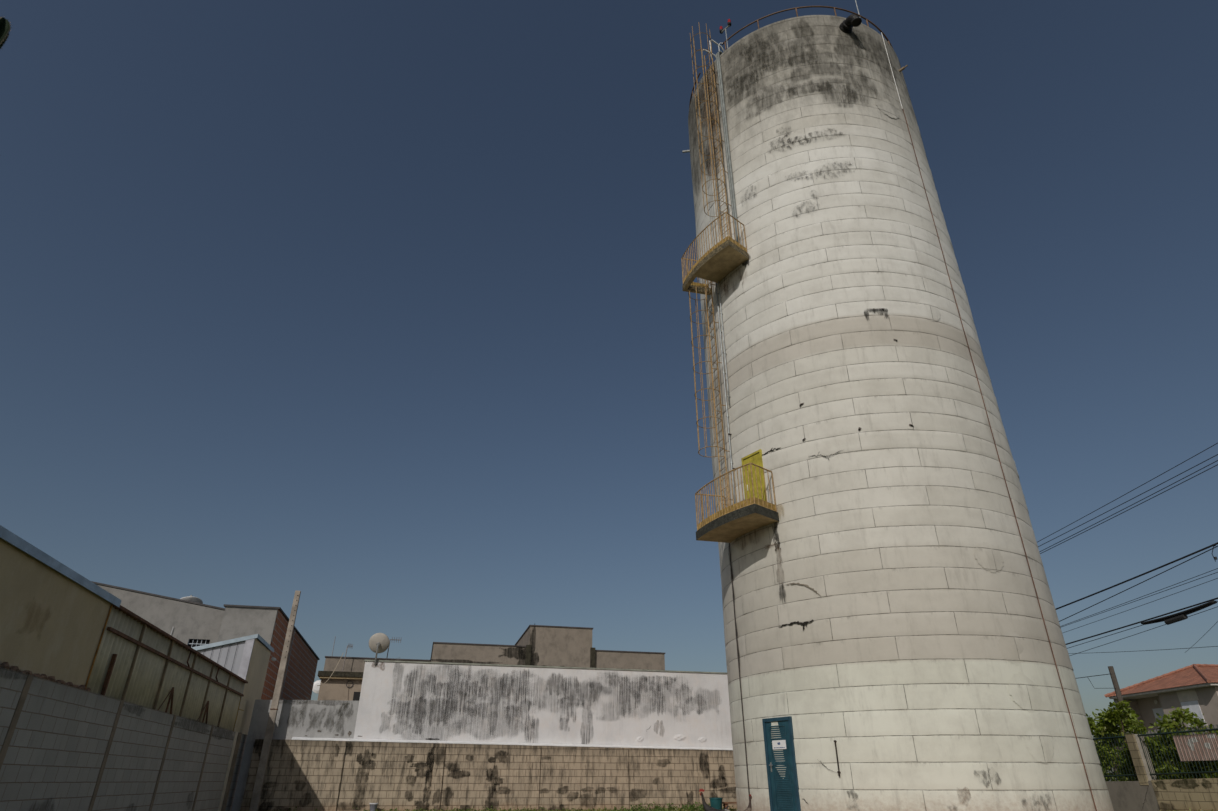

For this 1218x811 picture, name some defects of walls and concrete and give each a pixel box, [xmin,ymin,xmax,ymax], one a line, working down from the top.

damp [726,22,895,106]
crack [780,619,814,631]
damp [410,624,539,740]
damp [285,702,374,811]
damp [405,748,473,811]
damp [485,750,510,809]
damp [699,753,736,798]